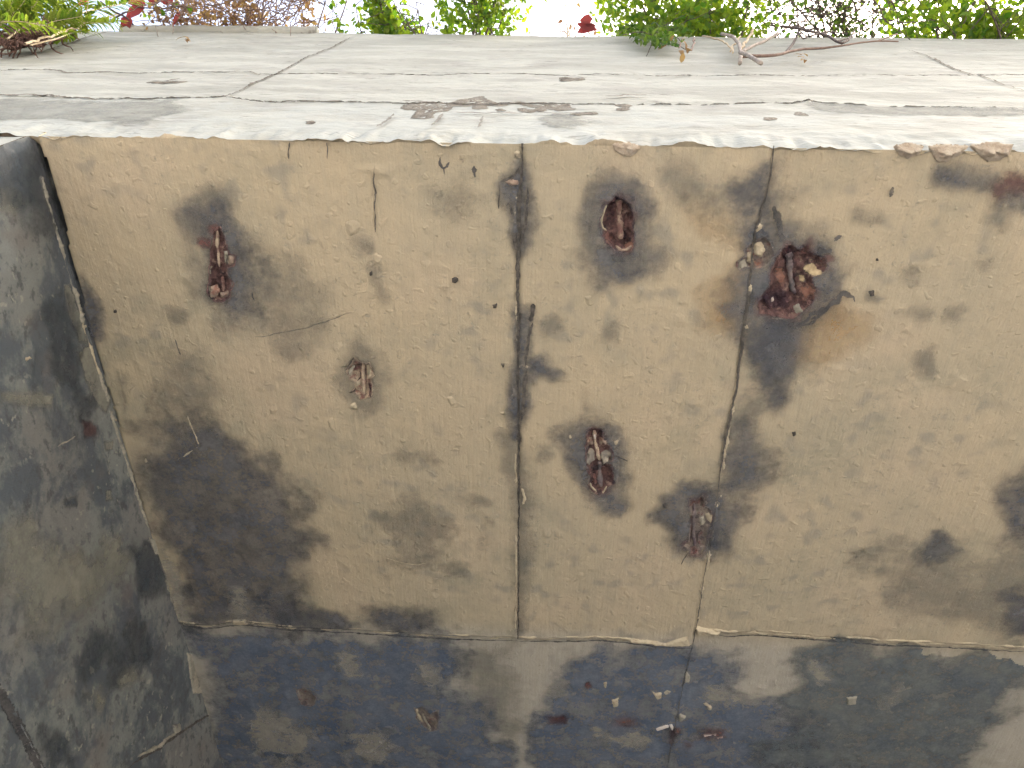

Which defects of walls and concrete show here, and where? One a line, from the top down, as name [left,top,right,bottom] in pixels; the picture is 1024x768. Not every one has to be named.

damp [0,139,61,232]
damp [81,285,102,341]
damp [176,197,258,319]
spalling [197,225,237,302]
spalling [599,195,635,252]
spalling [736,237,833,319]
spalling [893,142,1013,162]
crack [498,143,536,639]
spalling [584,427,627,495]
crack [667,146,784,766]
damp [131,420,1024,768]
damp [81,623,151,689]